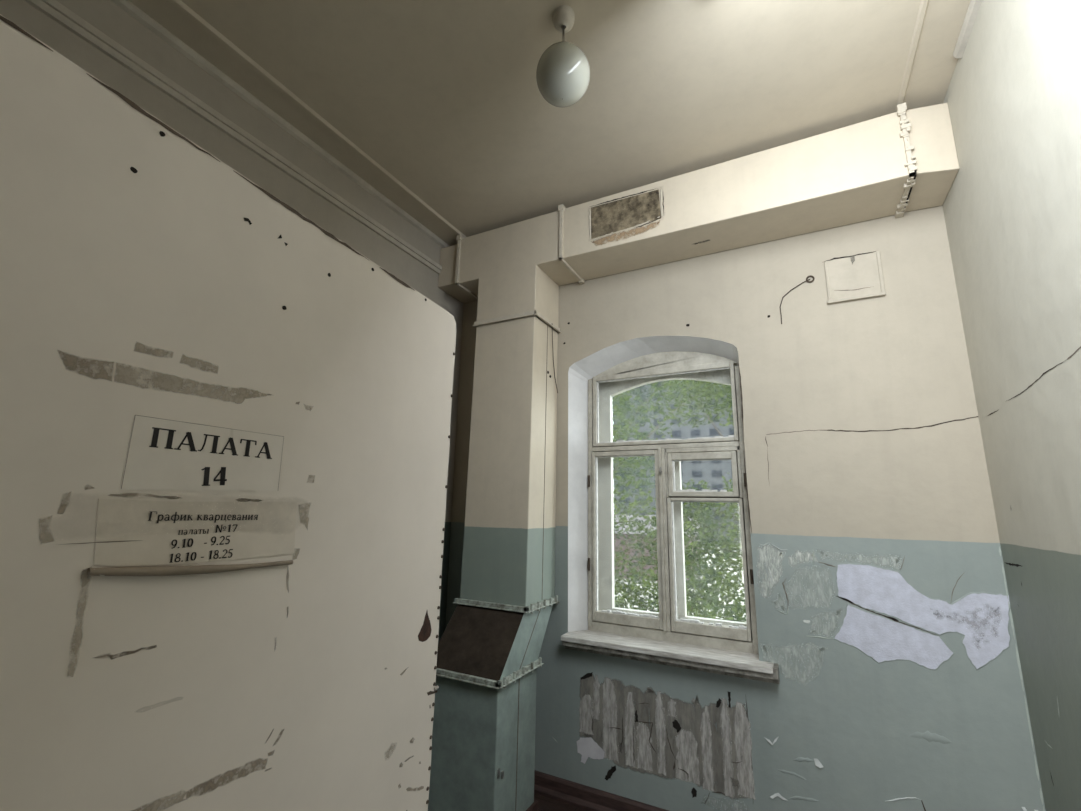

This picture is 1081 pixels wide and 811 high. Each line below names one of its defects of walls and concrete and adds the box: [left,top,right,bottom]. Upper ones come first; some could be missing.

crack [738,346,1081,532]
peeling [809,547,1044,811]
crack [888,797,926,811]